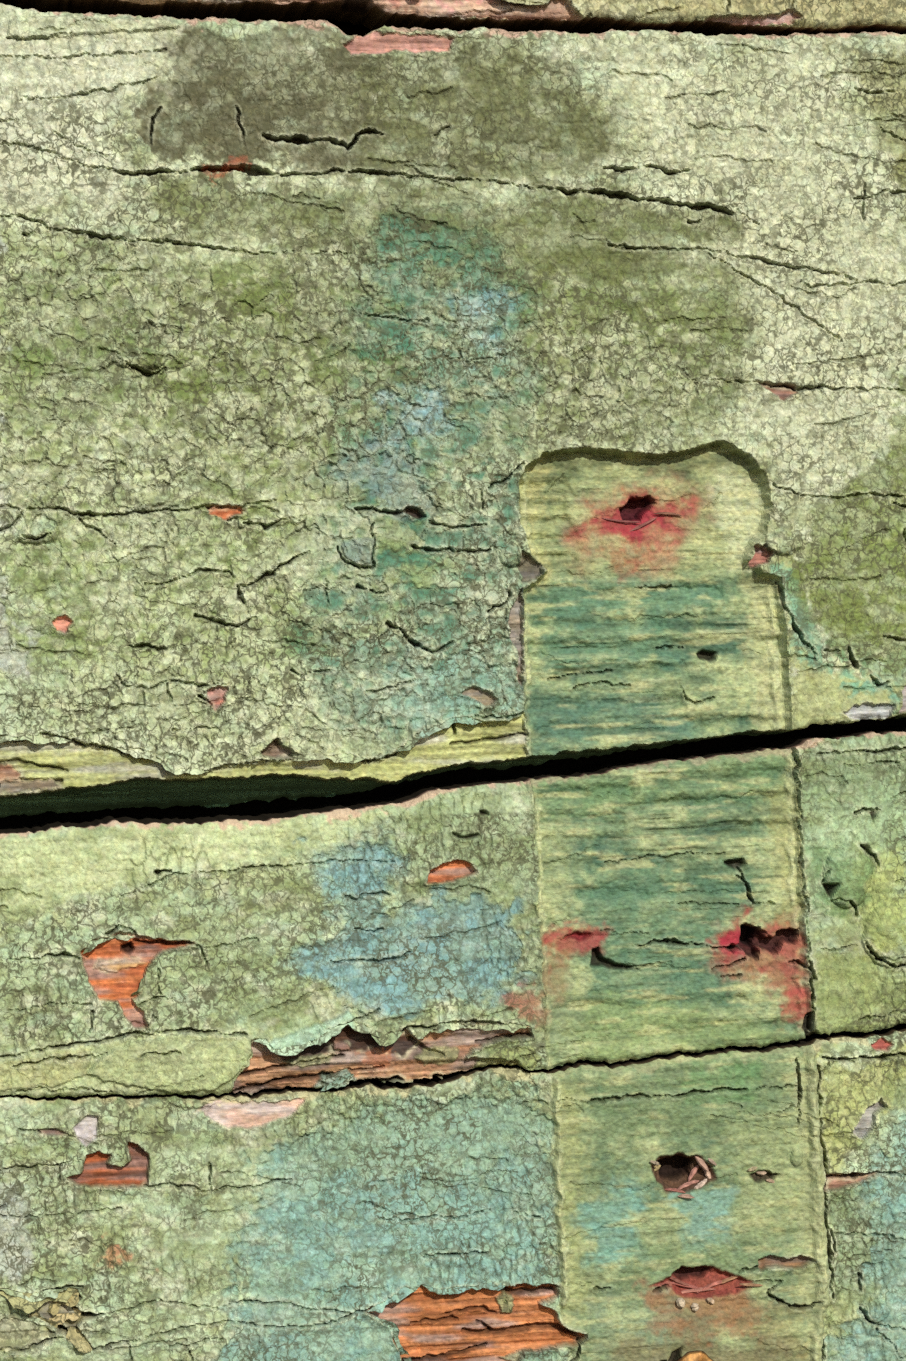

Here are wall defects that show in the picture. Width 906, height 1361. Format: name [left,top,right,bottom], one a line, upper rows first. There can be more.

peeling [5,0,583,41]
crack [0,30,906,340]
crack [674,378,904,392]
crack [772,483,906,550]
crack [0,462,528,693]
crack [774,580,906,687]
crack [5,643,294,776]
peeling [0,685,528,818]
peeling [843,686,906,721]
peeling [0,931,542,1131]
peeling [38,1114,151,1189]
peeling [366,1280,582,1361]